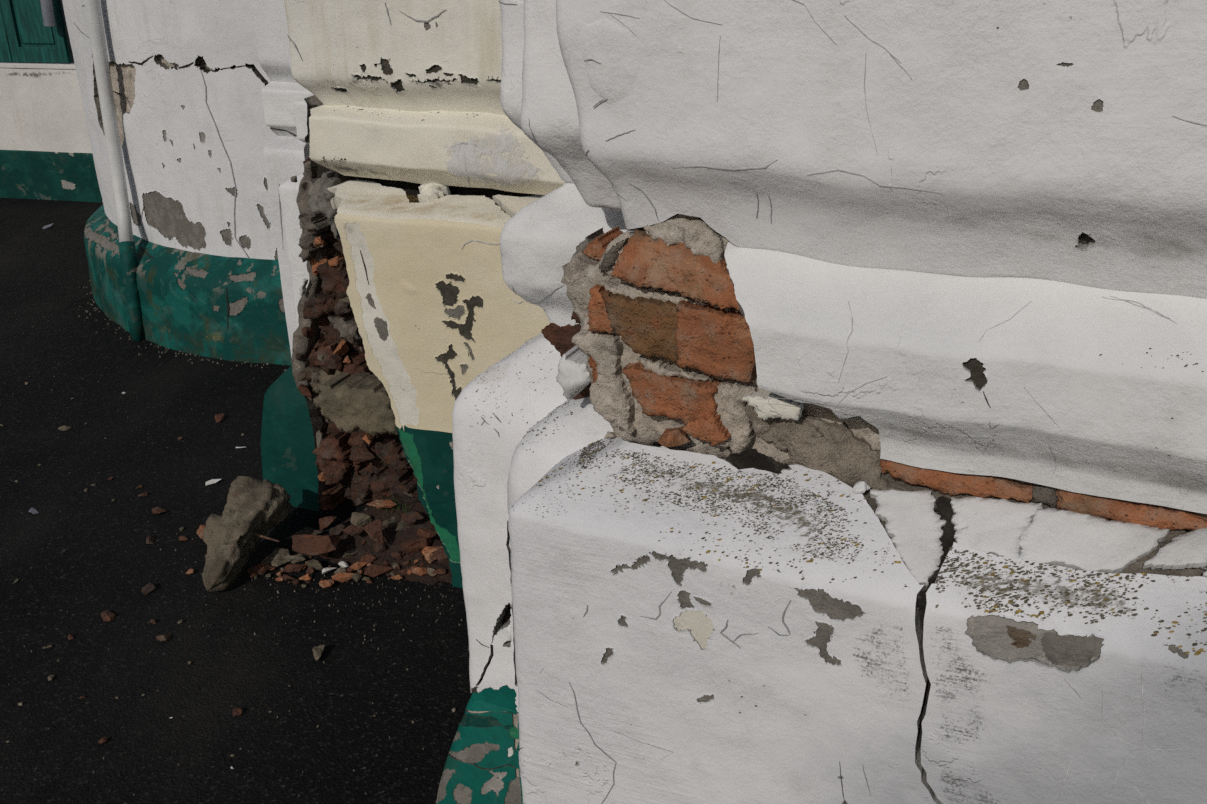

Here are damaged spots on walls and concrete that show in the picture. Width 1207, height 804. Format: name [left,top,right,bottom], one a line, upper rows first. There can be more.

flaking render [329,55,501,96]
crack [128,55,268,259]
crack [317,142,538,210]
peeling [129,190,252,253]
peeling [433,271,486,404]
flaking render [541,214,1207,601]
peeling [609,548,716,651]
peeling [793,585,868,667]
crack [917,598,927,631]
flaking render [963,612,1109,674]
crack [919,678,931,750]
peeling [437,712,523,804]